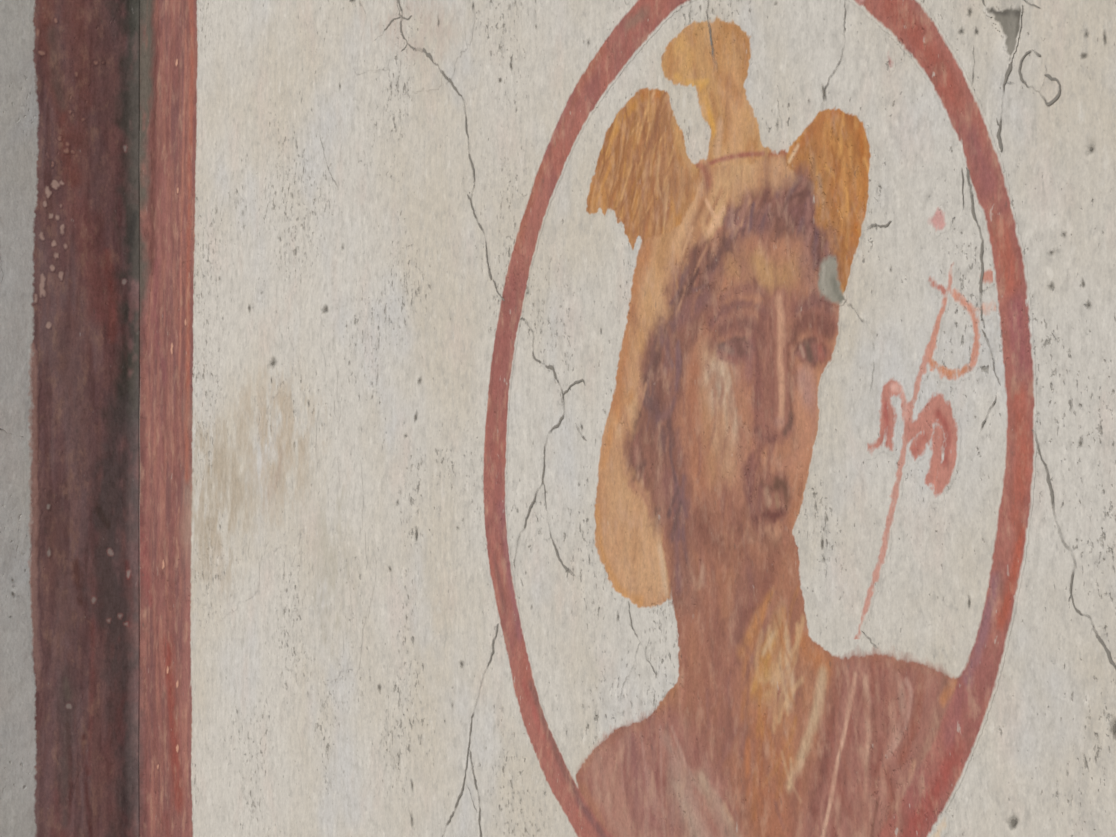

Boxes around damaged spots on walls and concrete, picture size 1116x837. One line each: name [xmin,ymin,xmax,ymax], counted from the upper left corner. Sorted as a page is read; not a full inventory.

spalling [968,4,1023,64]
peeling [33,134,76,305]
crack [384,0,523,319]
crack [524,352,587,572]
crack [1037,443,1054,508]
crack [487,623,499,667]
crack [1068,572,1116,669]
crack [446,714,481,837]